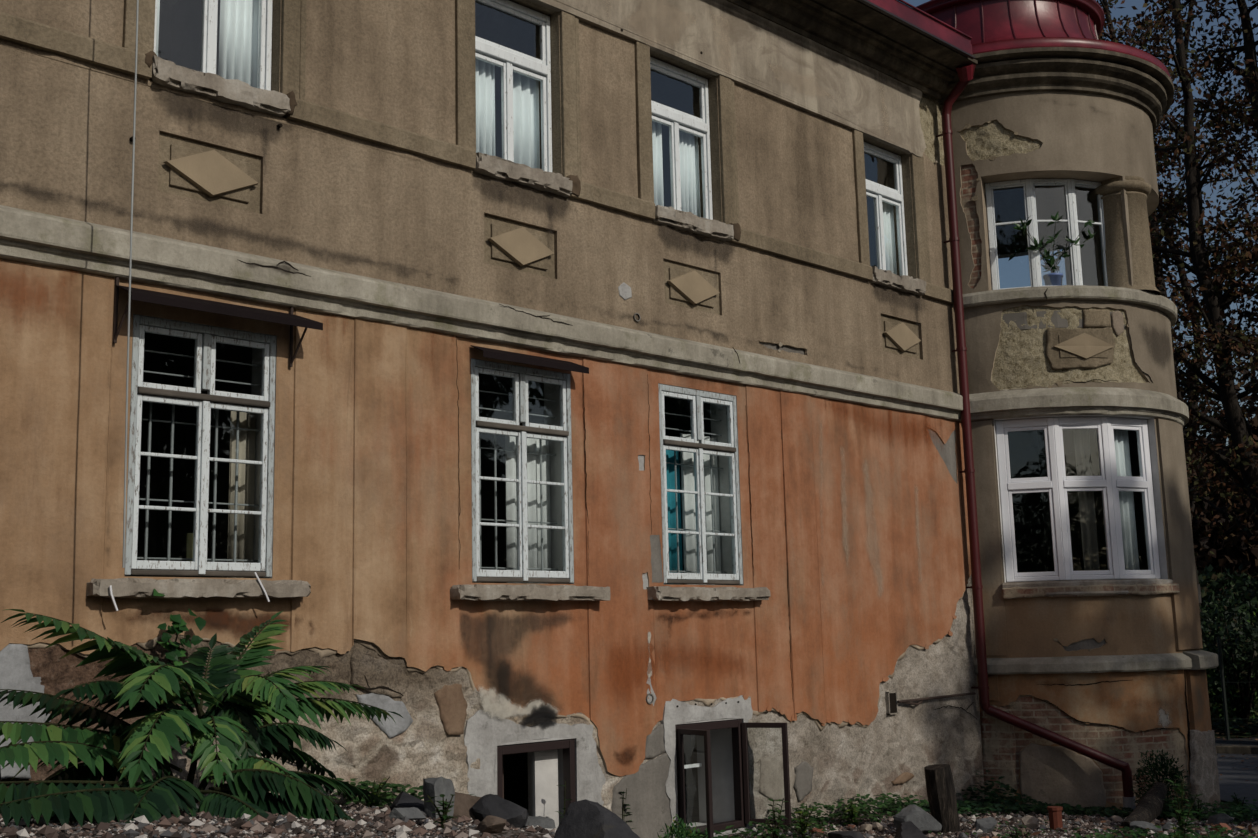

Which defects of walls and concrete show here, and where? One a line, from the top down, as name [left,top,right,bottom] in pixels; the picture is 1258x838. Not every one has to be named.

flaking render [919,93,944,166]
flaking render [958,120,1042,289]
crack [237,259,311,277]
flaking render [991,305,1147,390]
flaking render [0,642,158,788]
flaking render [131,633,491,807]
leakage [468,617,557,719]
flaking render [499,741,542,816]
flaking render [556,712,625,811]
flaking render [646,677,657,706]
flaking render [677,575,1221,830]